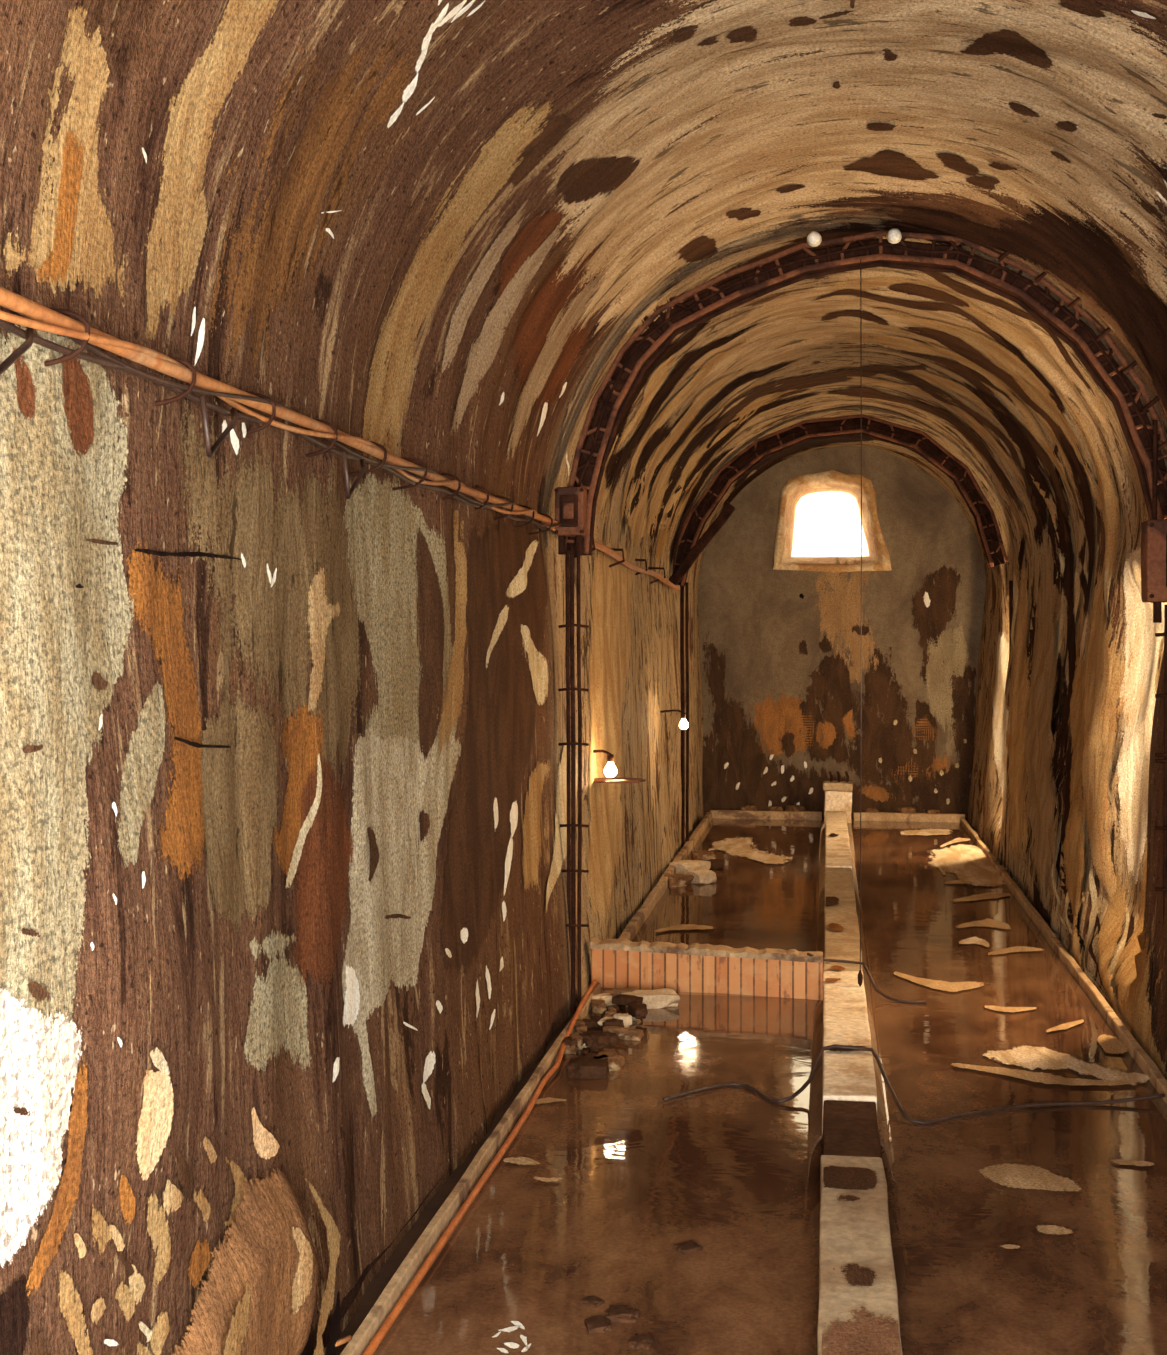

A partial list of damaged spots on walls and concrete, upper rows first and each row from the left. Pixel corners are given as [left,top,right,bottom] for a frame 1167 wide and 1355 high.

leakage [360,0,1167,487]
leakage [439,267,1167,1023]
corrosion [126,540,205,885]
corrosion [749,690,856,758]
flaking render [0,324,136,1355]
leakage [952,1063,1141,1086]
leakage [1046,1019,1084,1032]
leakage [1097,1034,1128,1054]
leakage [503,1157,562,1182]
leakage [823,1165,877,1202]
leakage [301,1168,449,1355]
leakage [834,1263,877,1287]